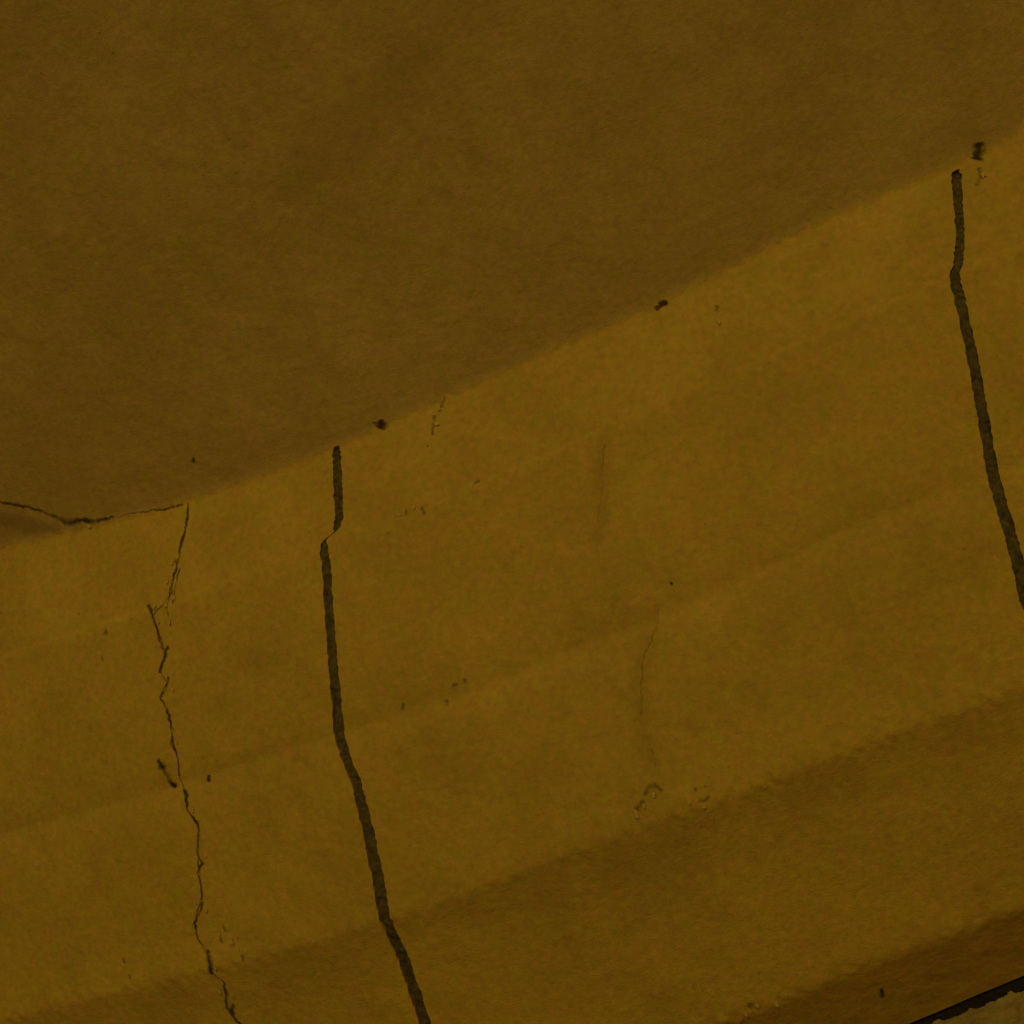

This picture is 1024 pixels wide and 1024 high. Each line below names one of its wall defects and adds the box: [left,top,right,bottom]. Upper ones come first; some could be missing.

crack [1,502,113,529]
crack [140,504,241,1024]